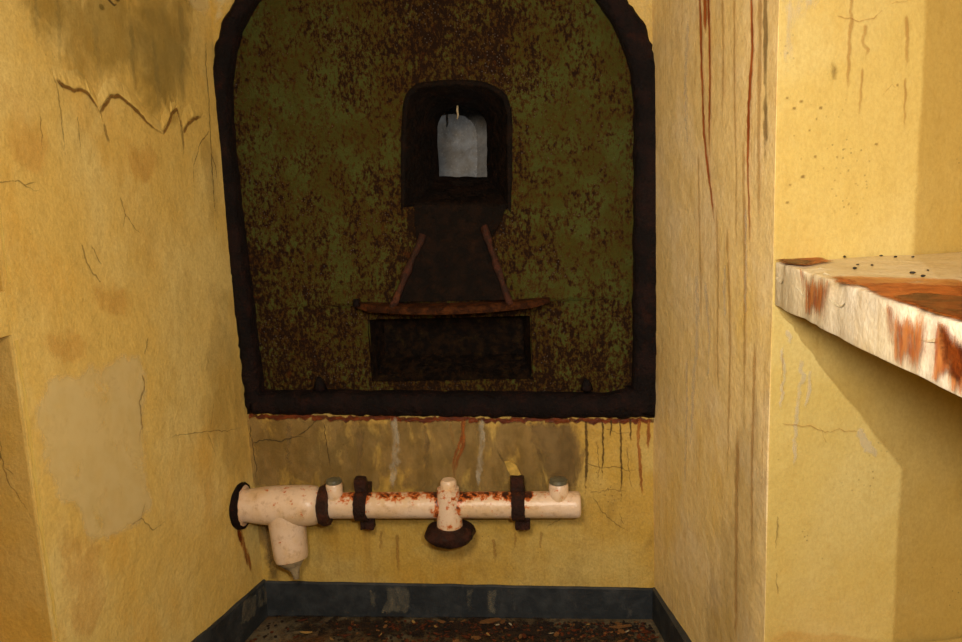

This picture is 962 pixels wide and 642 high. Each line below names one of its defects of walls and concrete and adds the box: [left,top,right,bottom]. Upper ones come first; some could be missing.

rust [780,257,962,394]
rust [249,413,654,489]
rust [237,529,251,570]